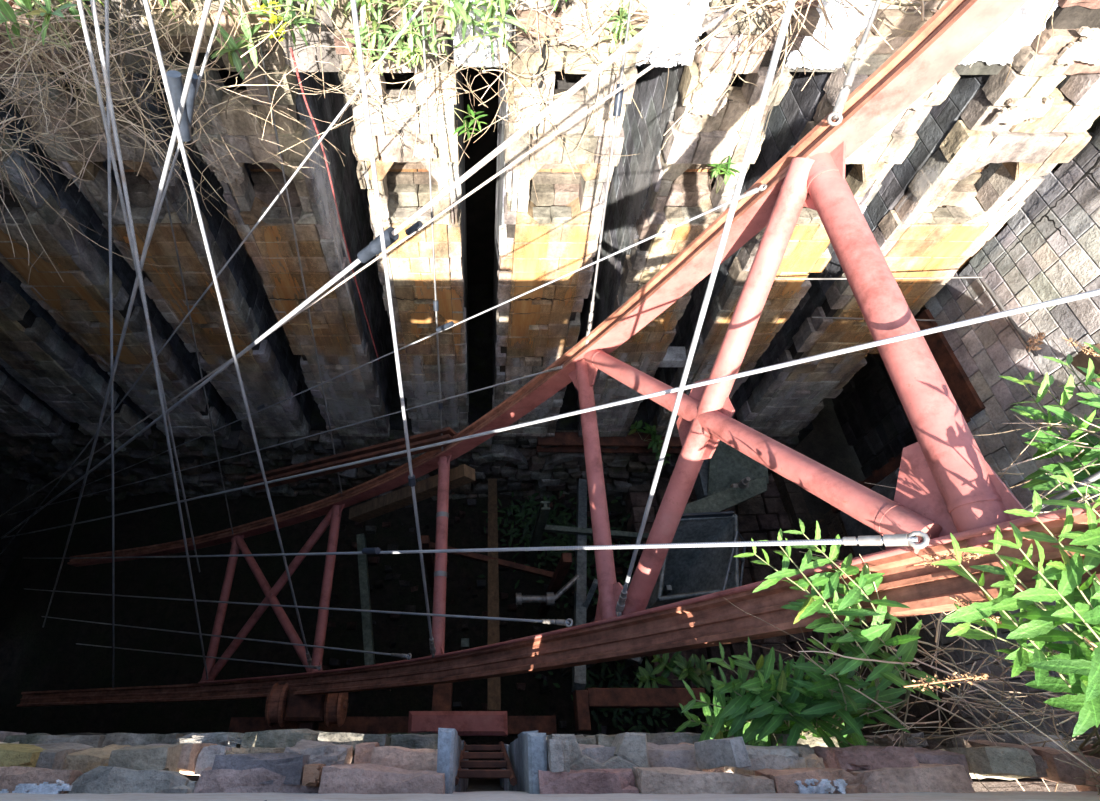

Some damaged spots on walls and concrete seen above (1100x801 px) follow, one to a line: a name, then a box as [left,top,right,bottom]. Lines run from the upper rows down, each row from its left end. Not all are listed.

peeling [784,0,875,70]
peeling [960,0,1058,65]
spalling [1055,27,1100,66]
spalling [989,95,1055,126]